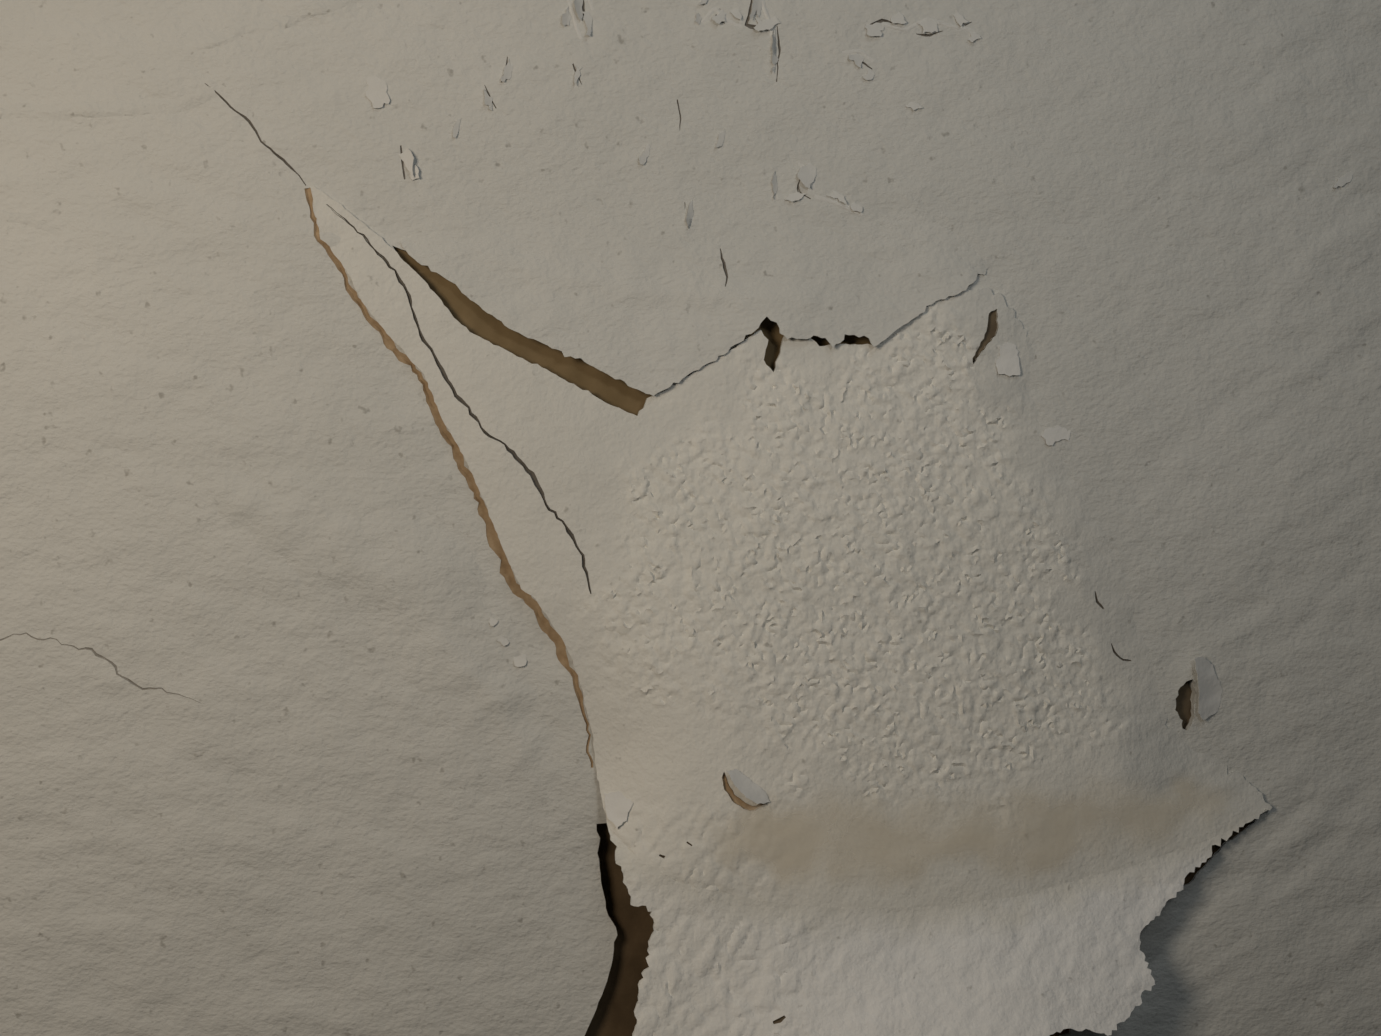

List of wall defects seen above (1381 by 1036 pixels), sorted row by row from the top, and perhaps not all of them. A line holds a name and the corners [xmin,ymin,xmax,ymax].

crack [0,633,200,703]
crack [205,83,593,768]
flaking render [311,162,1272,1036]